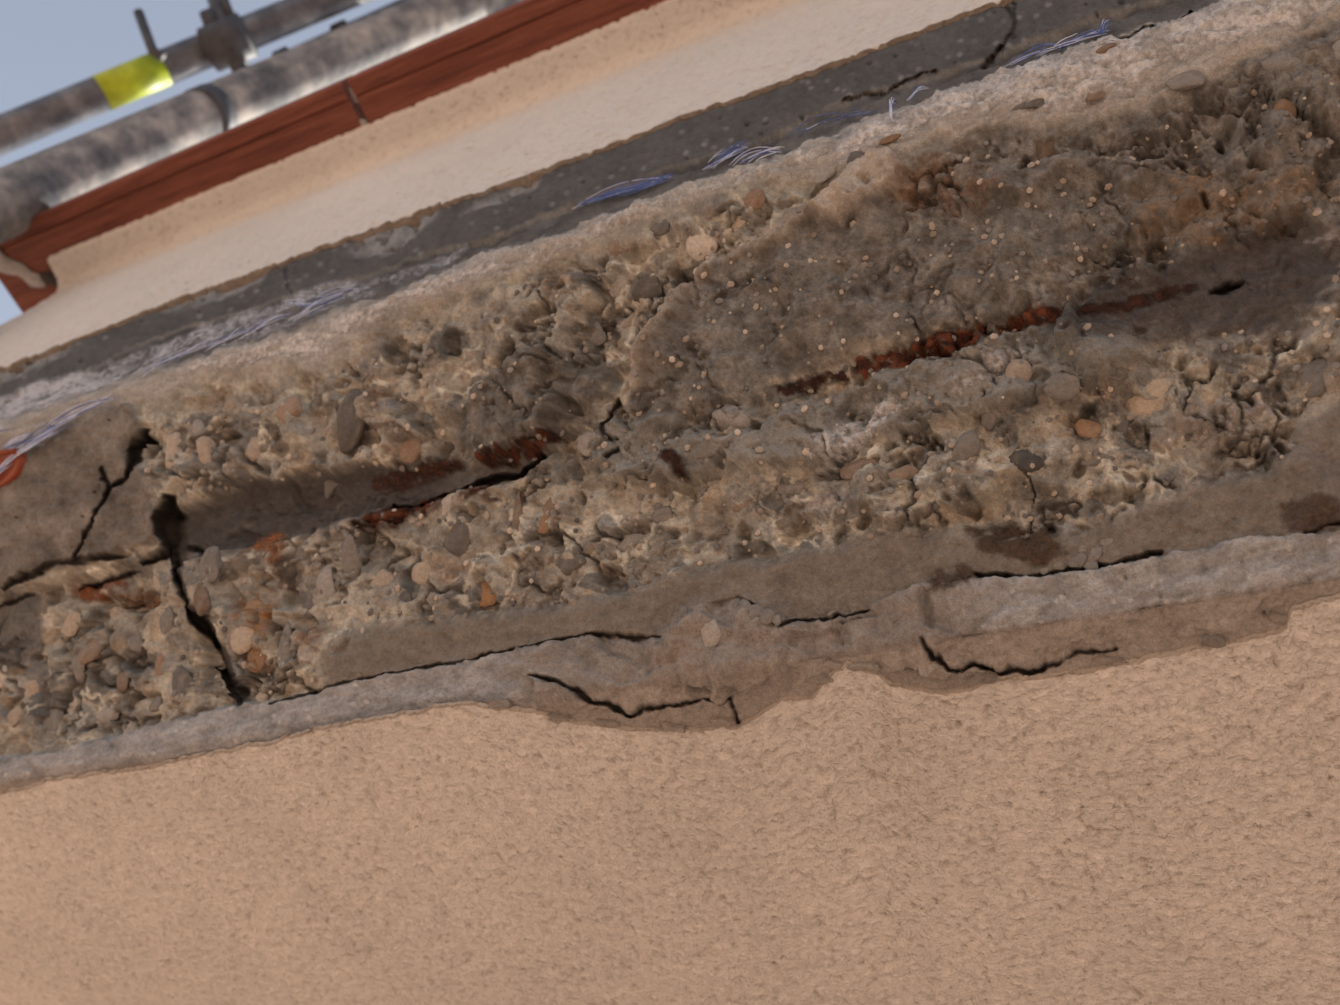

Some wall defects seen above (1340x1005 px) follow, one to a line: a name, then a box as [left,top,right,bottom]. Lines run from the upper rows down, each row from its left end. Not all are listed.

crack [982,3,1018,70]
crack [843,69,937,103]
rust [1080,284,1198,314]
spalling [0,0,1340,757]
rust [777,306,1063,395]
crack [598,398,623,458]
rust [372,428,565,491]
rust [660,448,687,480]
rust [350,486,499,534]
crack [0,429,741,724]
crack [923,639,1109,676]